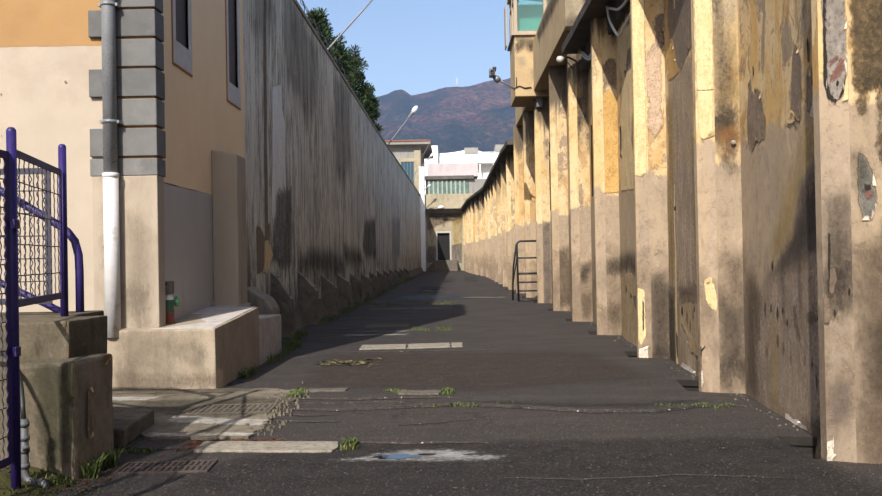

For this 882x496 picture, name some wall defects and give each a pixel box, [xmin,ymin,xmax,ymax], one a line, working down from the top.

damp [715,0,731,133]
peeling [746,68,766,151]
peeling [786,38,814,124]
peeling [821,0,848,101]
damp [849,0,882,159]
flaking render [591,0,718,358]
flaking render [857,152,877,220]
flaking render [681,363,704,391]